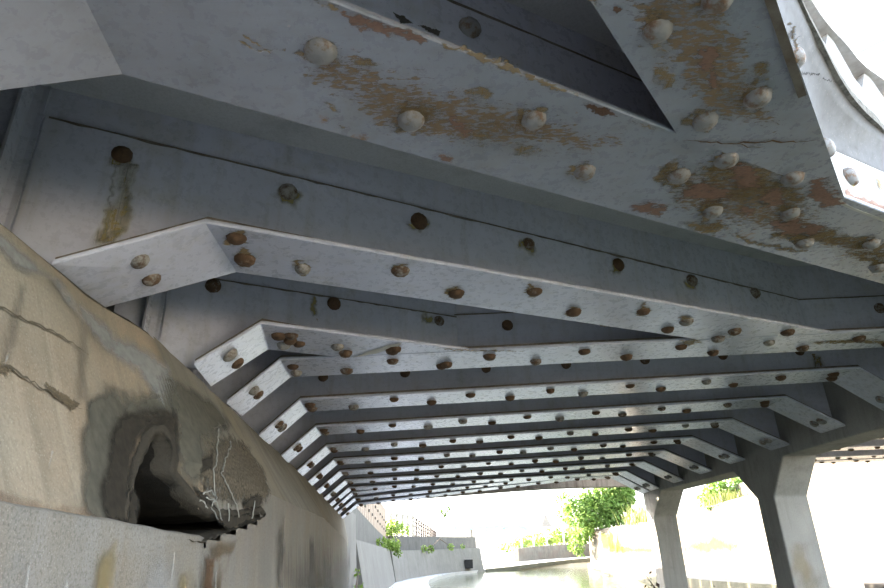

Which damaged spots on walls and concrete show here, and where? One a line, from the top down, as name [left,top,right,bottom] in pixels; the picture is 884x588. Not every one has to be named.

corrosion [316,0,427,45]
corrosion [240,35,622,175]
corrosion [613,0,778,134]
corrosion [653,152,884,266]
crack [0,364,82,409]
crack [0,306,89,355]
spalling [125,423,271,543]
leakage [278,526,350,588]